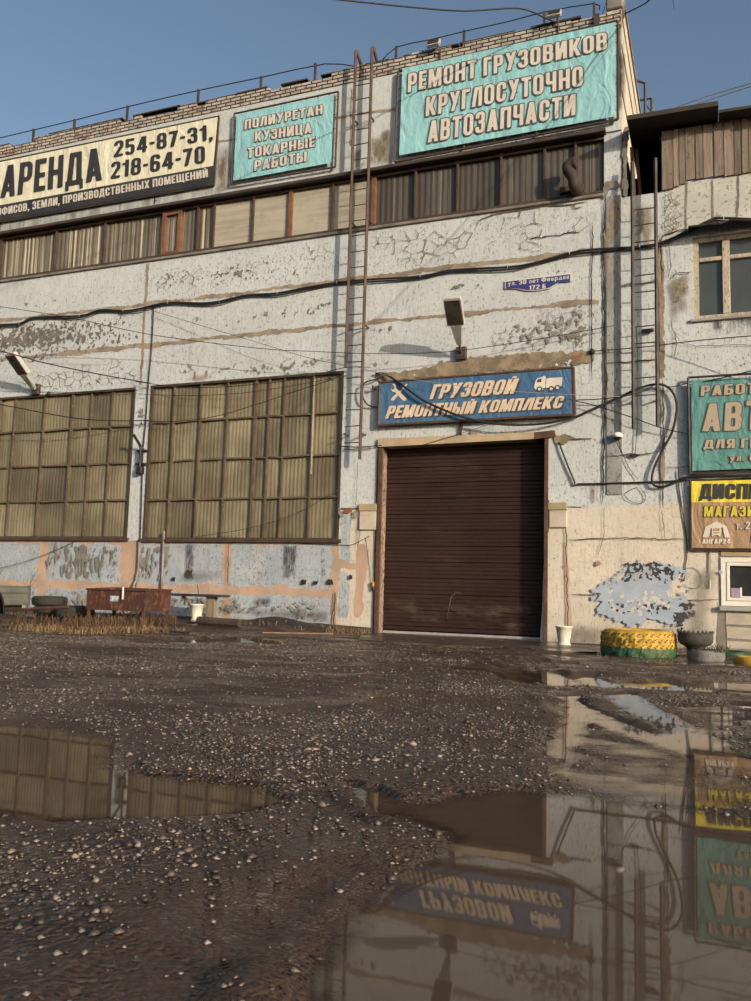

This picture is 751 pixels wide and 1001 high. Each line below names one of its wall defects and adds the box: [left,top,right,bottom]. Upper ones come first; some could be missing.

crack [660,190,690,283]
peeling [0,299,140,365]
crack [665,322,744,355]
crack [373,202,689,626]
peeling [46,542,117,579]
peeling [138,546,172,581]
peeling [170,596,318,620]
peeling [591,559,698,630]